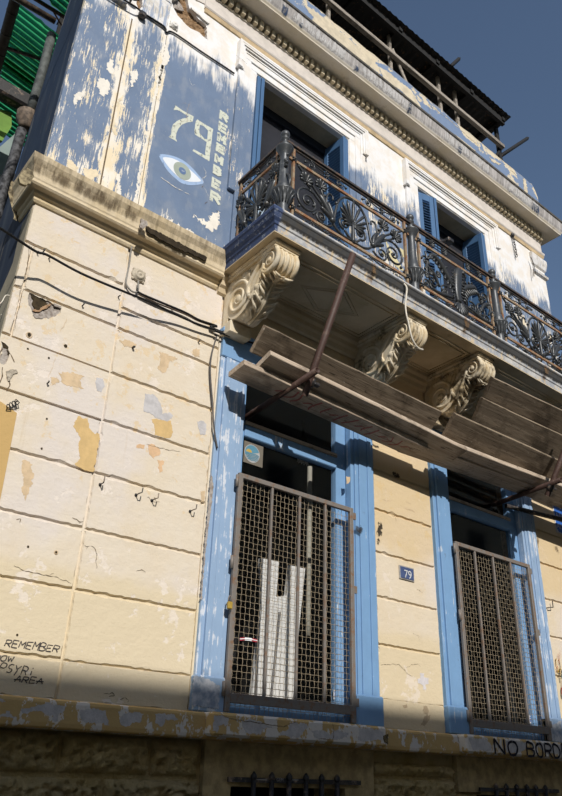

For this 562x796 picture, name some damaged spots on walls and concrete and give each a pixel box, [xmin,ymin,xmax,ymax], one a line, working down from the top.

flaking render [172,0,210,37]
peeling [304,5,479,151]
peeling [193,211,221,232]
flaking render [28,294,62,319]
peeling [50,372,84,389]
peeling [73,416,100,472]
peeling [136,394,173,473]
peeling [21,460,34,500]